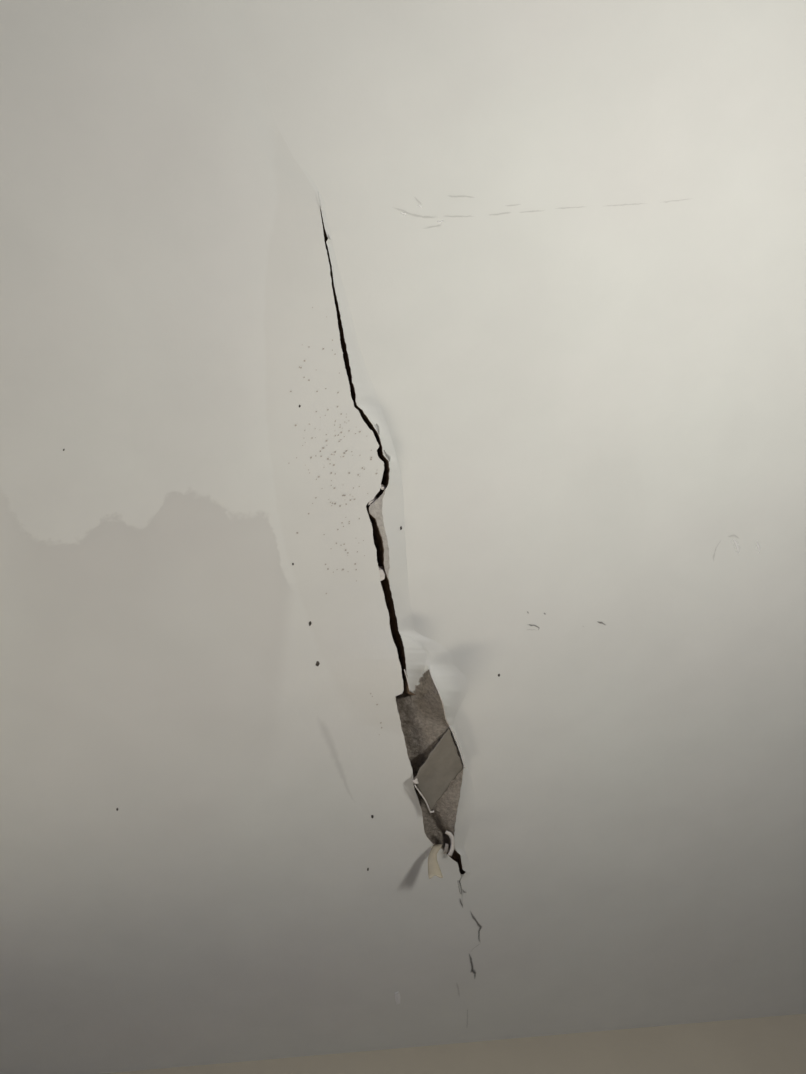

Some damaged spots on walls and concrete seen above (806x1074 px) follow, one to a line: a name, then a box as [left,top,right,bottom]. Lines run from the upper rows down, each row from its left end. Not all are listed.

crack [320,209,415,695]
flaking render [396,669,465,879]
crack [447,850,481,931]